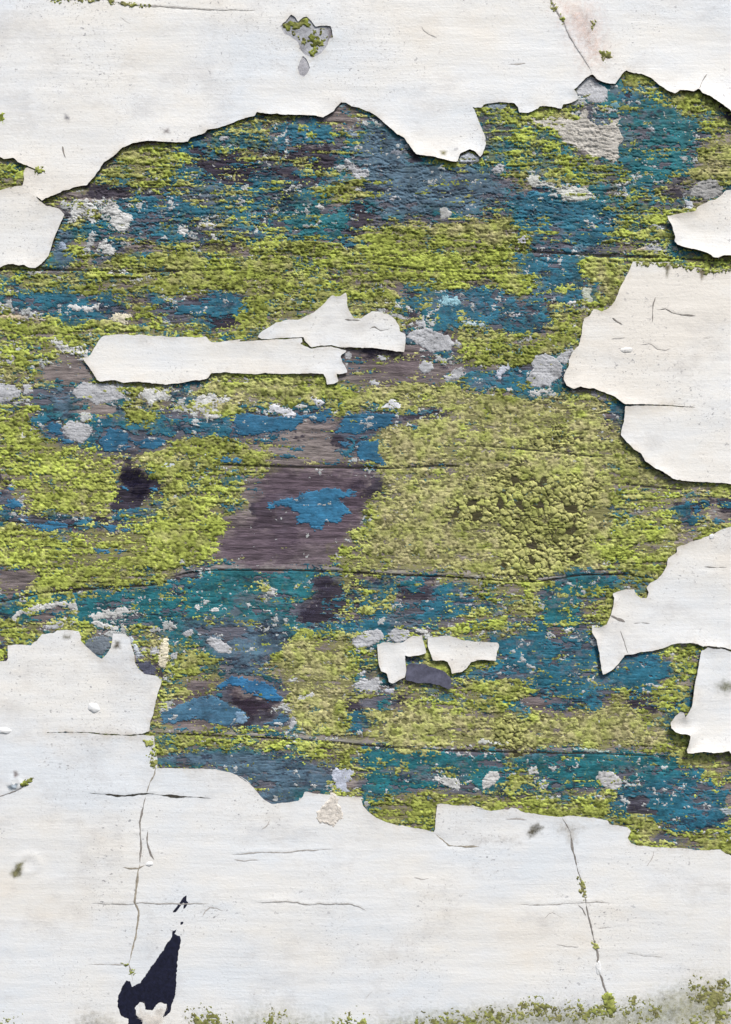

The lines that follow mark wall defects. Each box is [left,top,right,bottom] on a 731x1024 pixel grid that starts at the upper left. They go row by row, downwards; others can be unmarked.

crack [550,0,591,70]
peeling [0,0,731,275]
peeling [0,335,62,376]
peeling [0,441,263,582]
peeling [83,293,406,416]
peeling [253,434,305,459]
peeling [361,401,438,420]
peeling [424,350,464,364]
peeling [551,190,731,753]
peeling [0,618,731,1024]
crack [93,733,670,993]